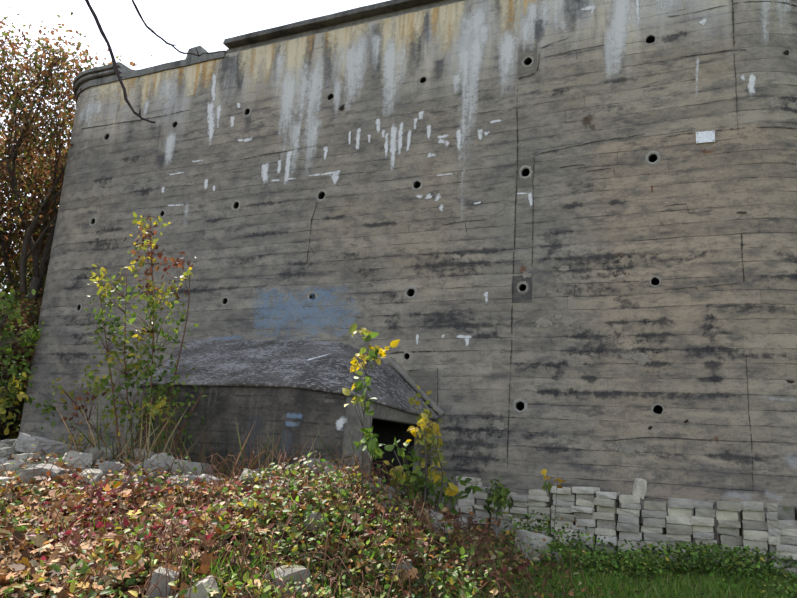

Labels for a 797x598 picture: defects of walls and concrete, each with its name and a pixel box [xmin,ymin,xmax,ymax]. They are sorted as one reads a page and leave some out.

corrosion [97,58,221,108]
leakage [207,54,243,145]
corrosion [239,35,315,94]
leakage [261,14,430,184]
corrosion [325,23,368,84]
corrosion [380,1,465,83]
leakage [348,9,501,169]
corrosion [499,0,538,36]
leakage [499,0,595,84]
crack [507,38,643,465]
leakage [530,362,735,399]
crack [745,355,753,480]